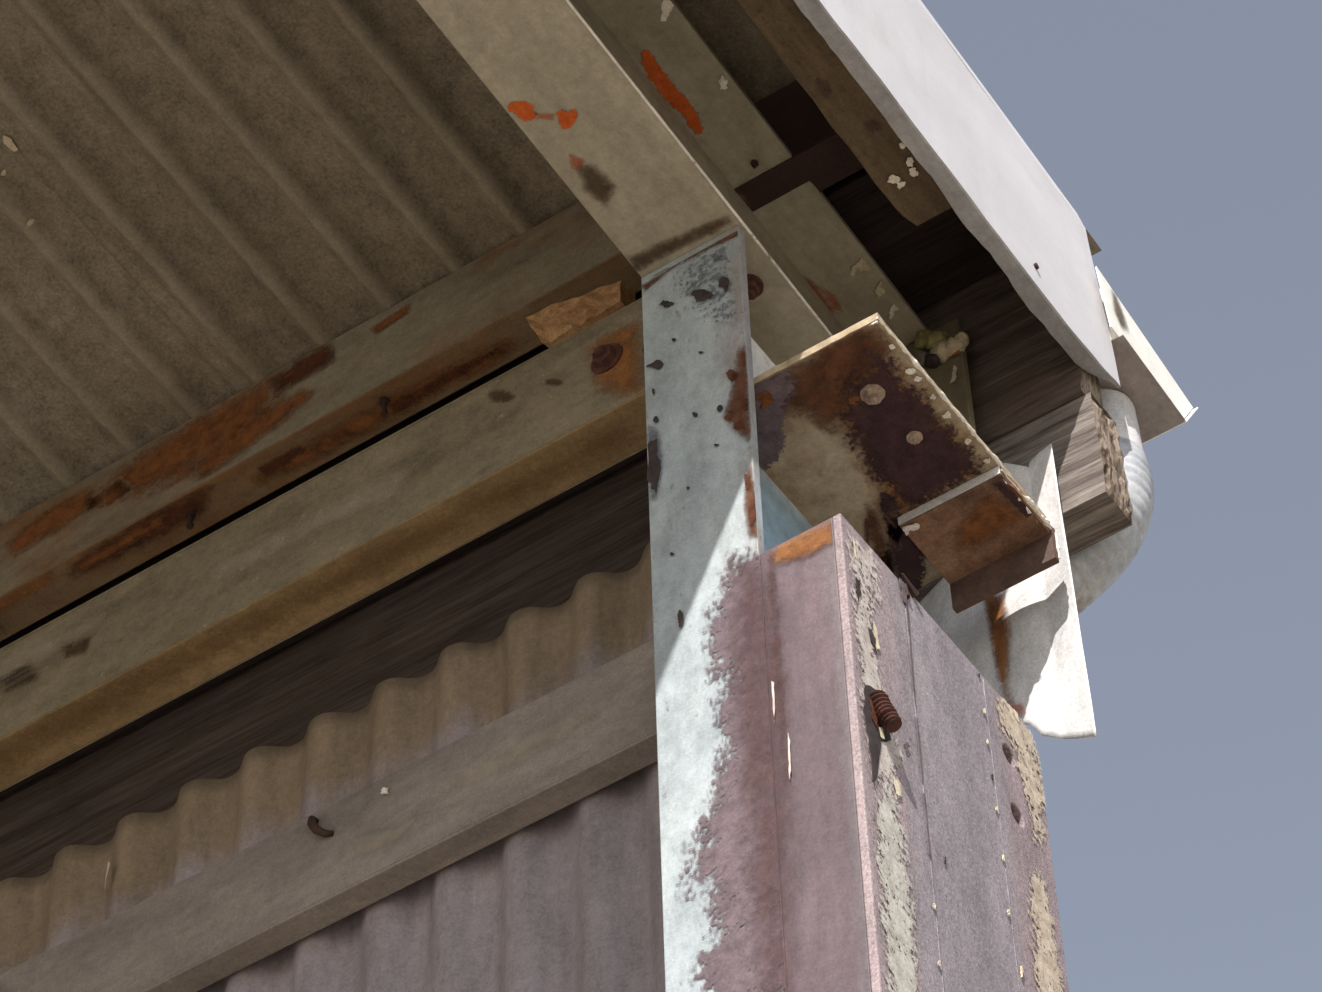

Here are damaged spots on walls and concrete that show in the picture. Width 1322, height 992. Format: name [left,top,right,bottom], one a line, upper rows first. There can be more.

peeling [3,135,18,152]
corrosion [372,305,408,333]
corrosion [7,346,334,575]
corrosion [252,340,514,482]
corrosion [724,324,984,590]
corrosion [957,483,1032,549]
corrosion [985,595,1023,713]
peeling [845,530,936,992]
peeling [983,697,1047,850]
peeling [1020,869,1065,992]